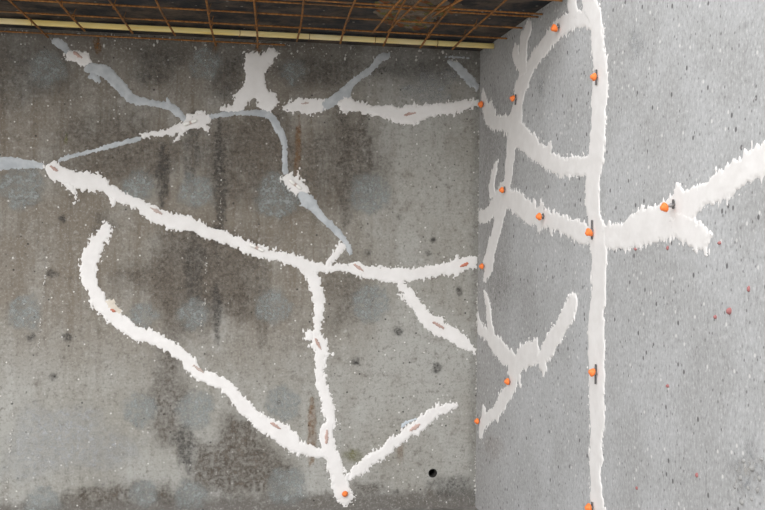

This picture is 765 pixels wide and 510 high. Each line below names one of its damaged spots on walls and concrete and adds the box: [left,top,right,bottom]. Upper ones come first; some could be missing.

leakage [67,124,177,206]
leakage [206,115,292,202]
leakage [129,231,253,338]
crack [0,38,477,507]
crack [279,0,765,510]
leakage [155,353,290,493]
leakage [61,485,175,504]